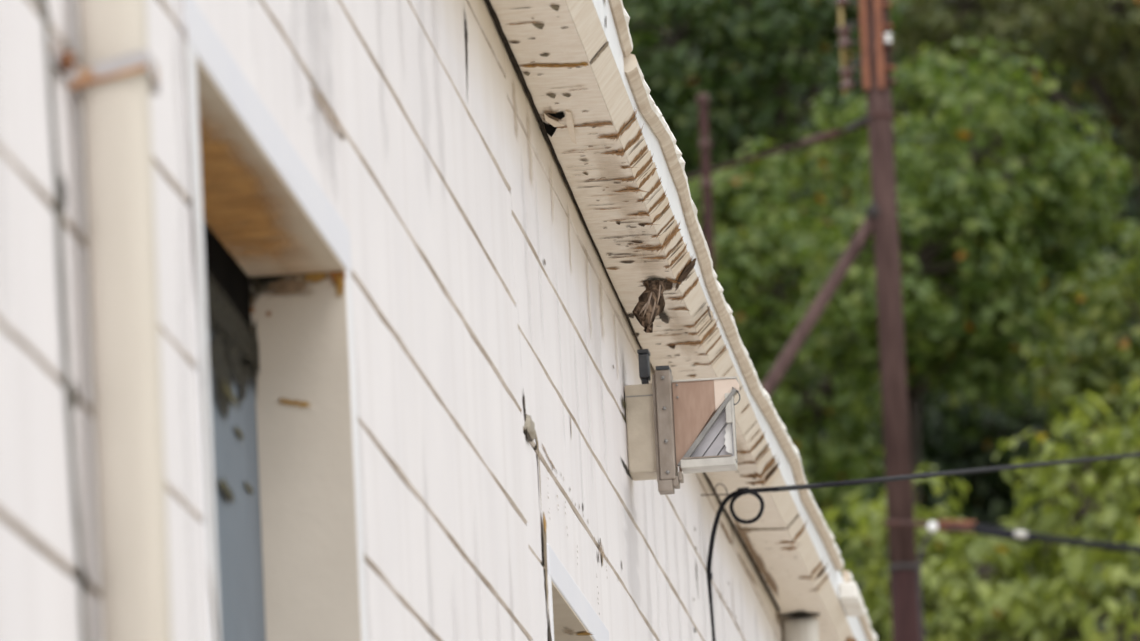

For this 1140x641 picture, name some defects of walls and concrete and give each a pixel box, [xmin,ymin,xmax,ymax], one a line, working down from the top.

peeling [544,94,729,377]
peeling [737,432,781,487]
mould [218,479,234,502]
peeling [777,520,808,550]
peeling [800,559,830,593]